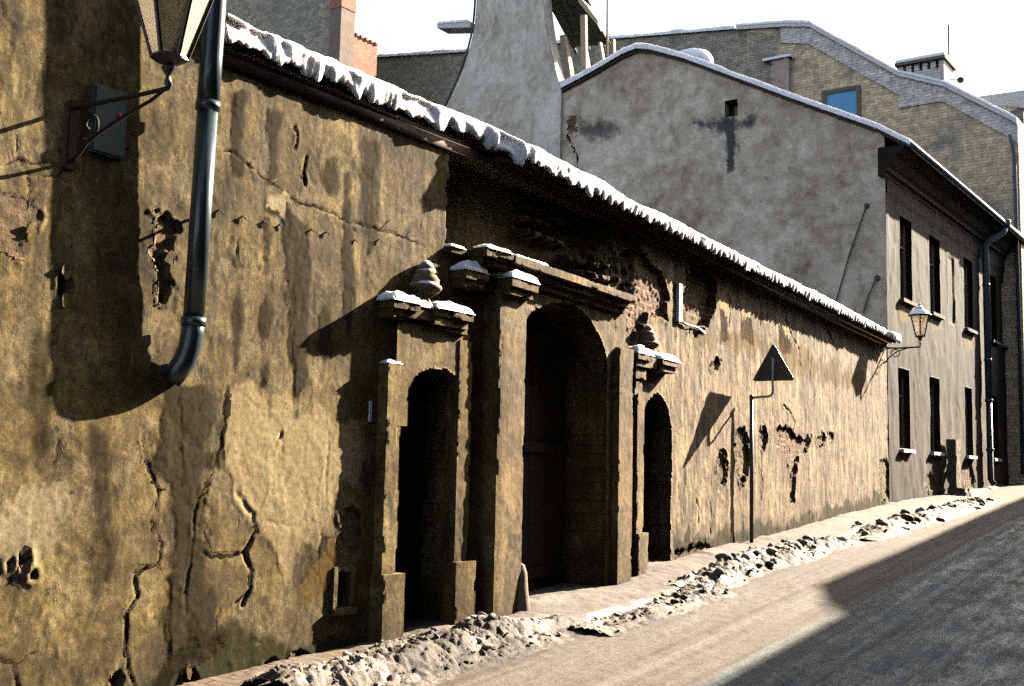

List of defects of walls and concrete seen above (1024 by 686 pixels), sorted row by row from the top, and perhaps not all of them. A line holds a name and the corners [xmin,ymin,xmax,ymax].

crack [224,126,425,247]
crack [566,132,579,167]
spalling [58,261,74,308]
spalling [148,205,182,305]
spalling [714,424,834,504]
peeling [0,483,71,582]
crack [124,386,256,686]